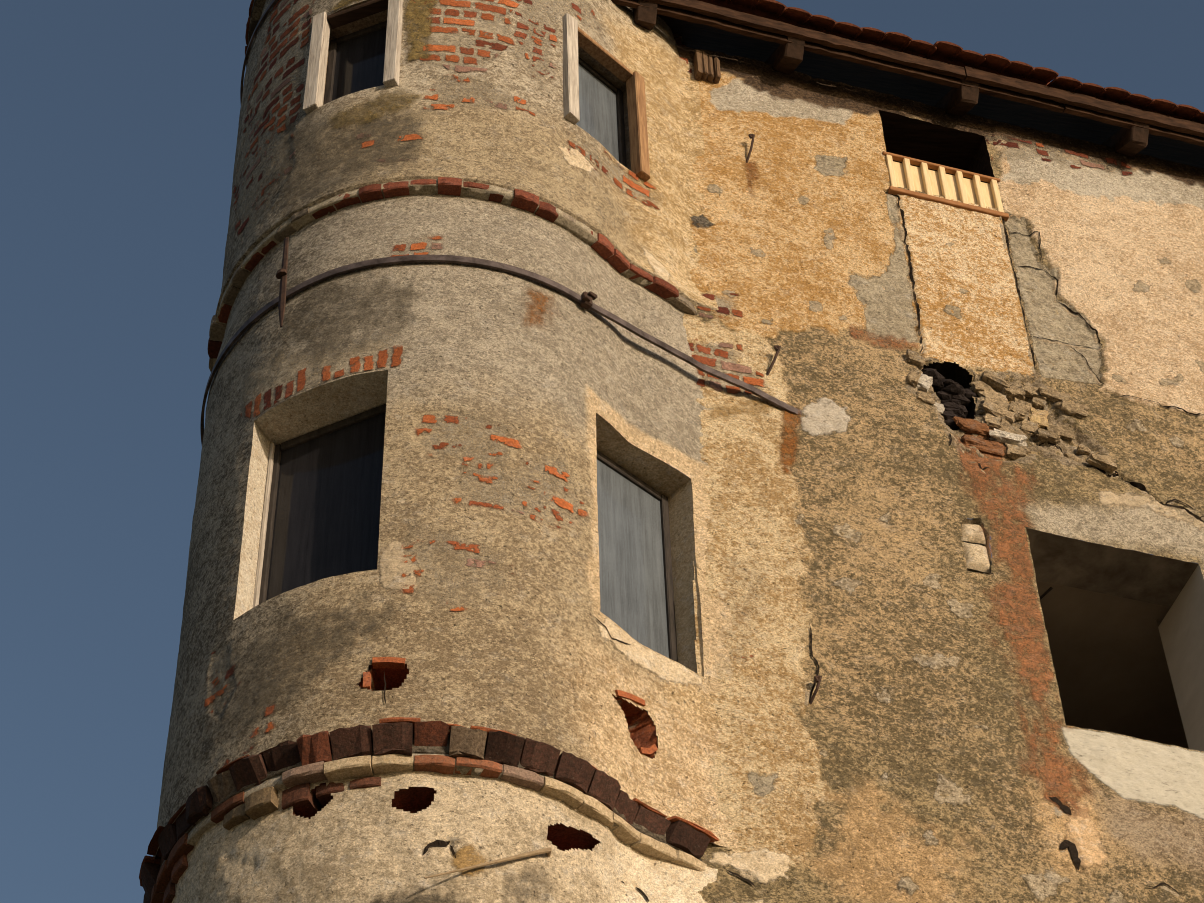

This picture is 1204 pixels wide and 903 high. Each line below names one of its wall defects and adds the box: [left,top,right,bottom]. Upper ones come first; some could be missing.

spalling [412,0,599,115]
spalling [233,0,314,243]
spalling [390,236,443,257]
spalling [848,191,1126,474]
crack [999,216,1204,415]
spalling [1159,374,1183,386]
crack [1037,443,1204,523]
spalling [1098,491,1204,529]
corrosion [957,428,1089,811]
crack [804,623,820,706]
spalling [392,787,437,813]
spalling [547,823,601,851]